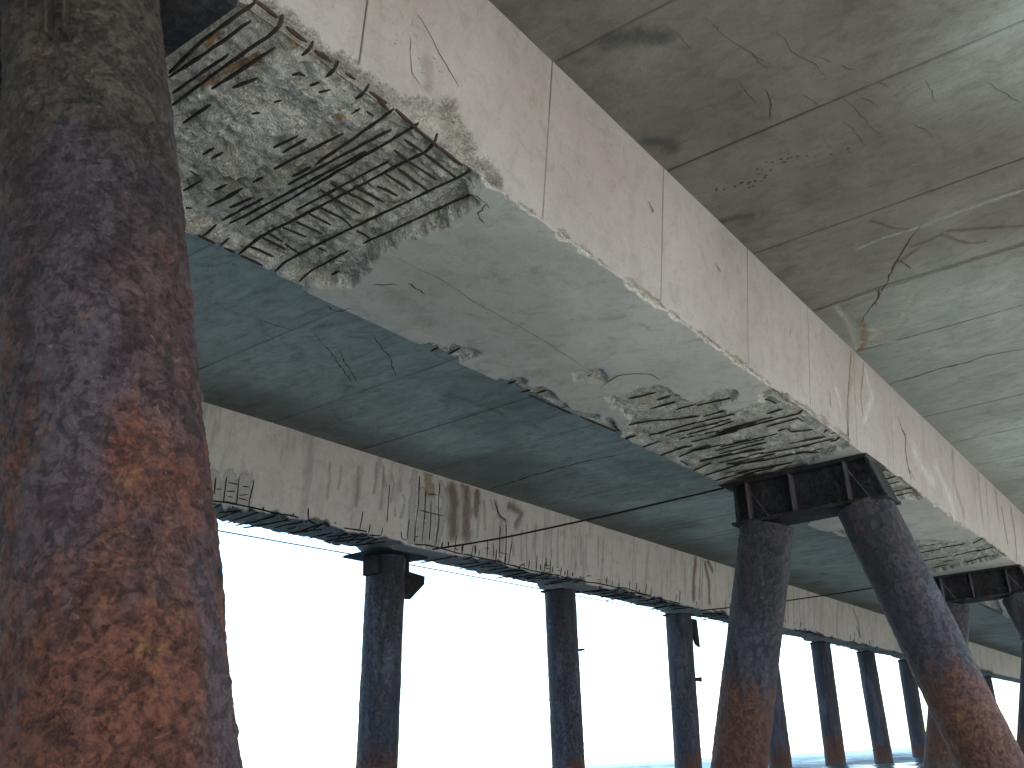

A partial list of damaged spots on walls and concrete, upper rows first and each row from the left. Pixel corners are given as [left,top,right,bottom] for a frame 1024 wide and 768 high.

crack [410,18,459,87]
crack [705,17,772,119]
spalling [166,0,852,484]
crack [862,225,921,322]
crack [316,335,359,385]
damp [448,483,480,540]
spalling [210,468,729,623]
spalling [883,467,1012,573]